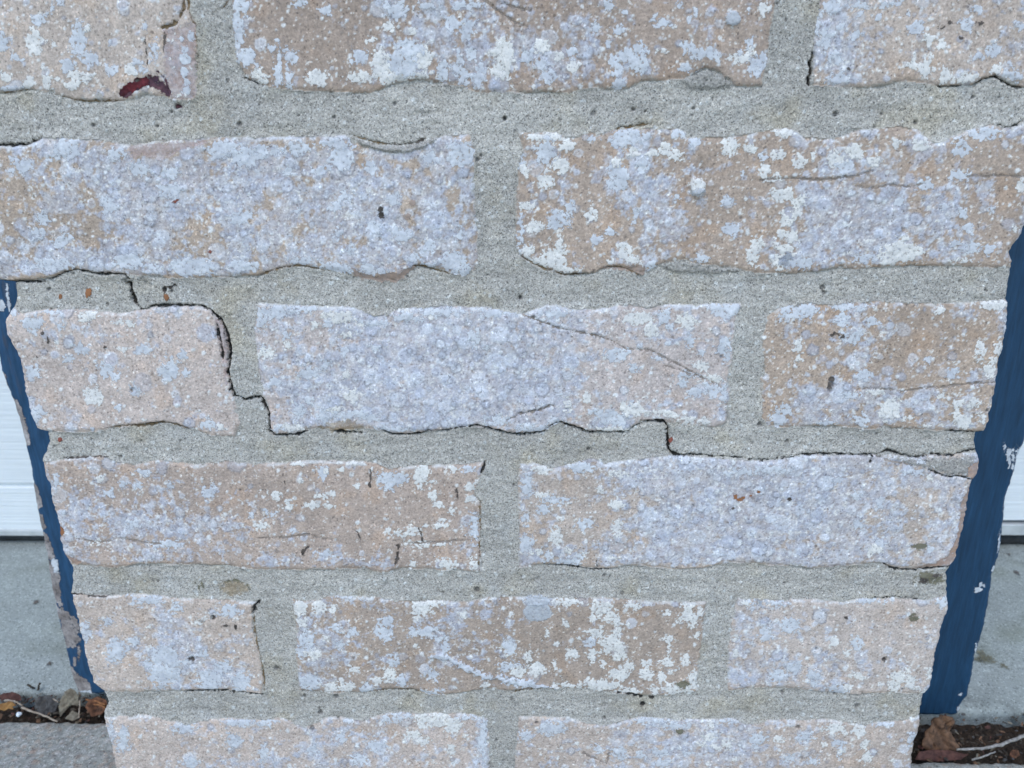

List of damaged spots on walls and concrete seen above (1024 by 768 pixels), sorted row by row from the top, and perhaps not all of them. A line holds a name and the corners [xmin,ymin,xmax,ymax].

crack [6,268,305,436]
peeling [13,398,49,447]
crack [337,419,975,479]
peeling [87,466,152,498]
peeling [199,482,217,503]
peeling [248,460,479,572]
peeling [150,539,190,551]
peeling [34,483,151,693]
peeling [125,593,186,615]
damp [913,571,945,585]
peeling [139,644,255,691]
damp [974,649,1009,669]